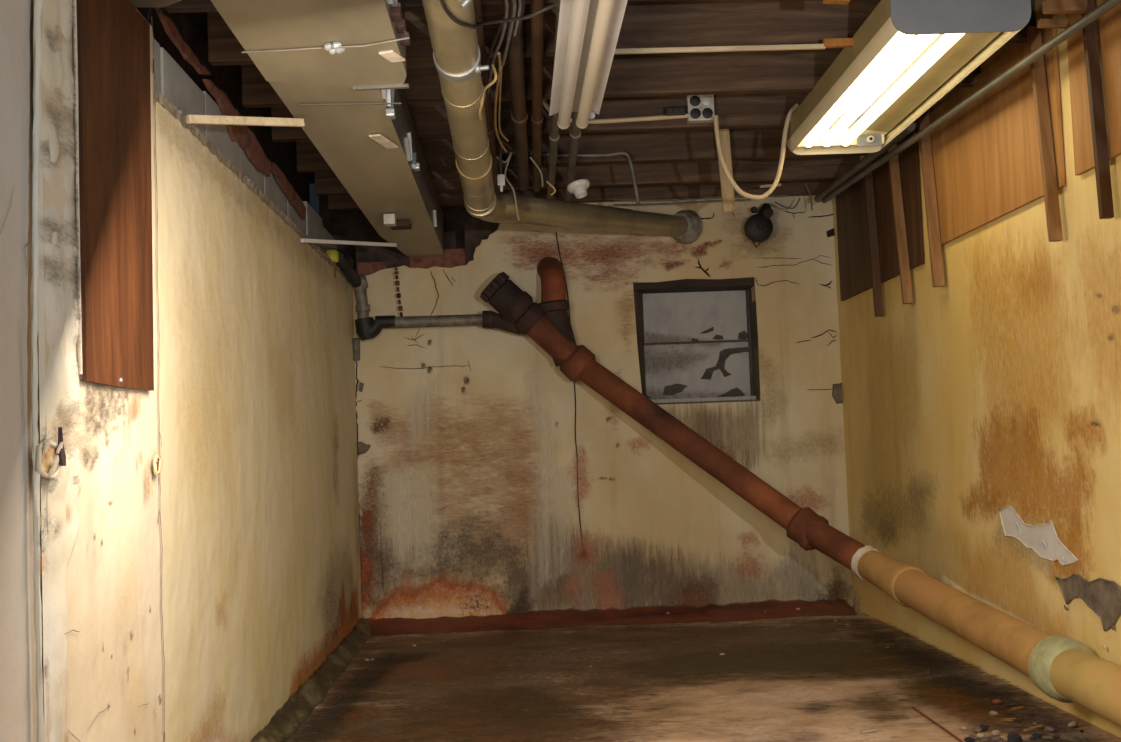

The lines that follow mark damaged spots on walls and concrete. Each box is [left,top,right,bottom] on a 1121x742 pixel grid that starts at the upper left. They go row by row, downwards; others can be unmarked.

crack [386,270,471,371]
crack [755,255,833,288]
spalling [36,427,66,480]
crack [355,361,363,459]
water stain [372,520,774,612]
peeling [998,505,1121,631]
water stain [291,618,1109,742]